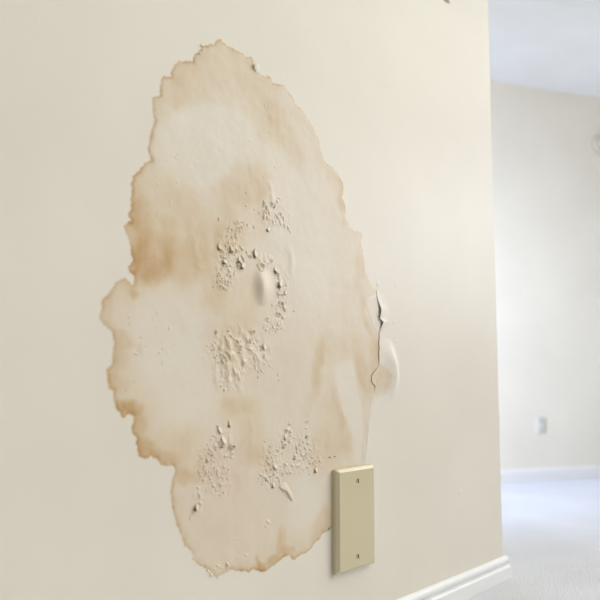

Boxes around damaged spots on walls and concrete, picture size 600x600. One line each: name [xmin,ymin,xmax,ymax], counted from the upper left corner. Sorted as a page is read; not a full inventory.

leakage [97,35,390,581]